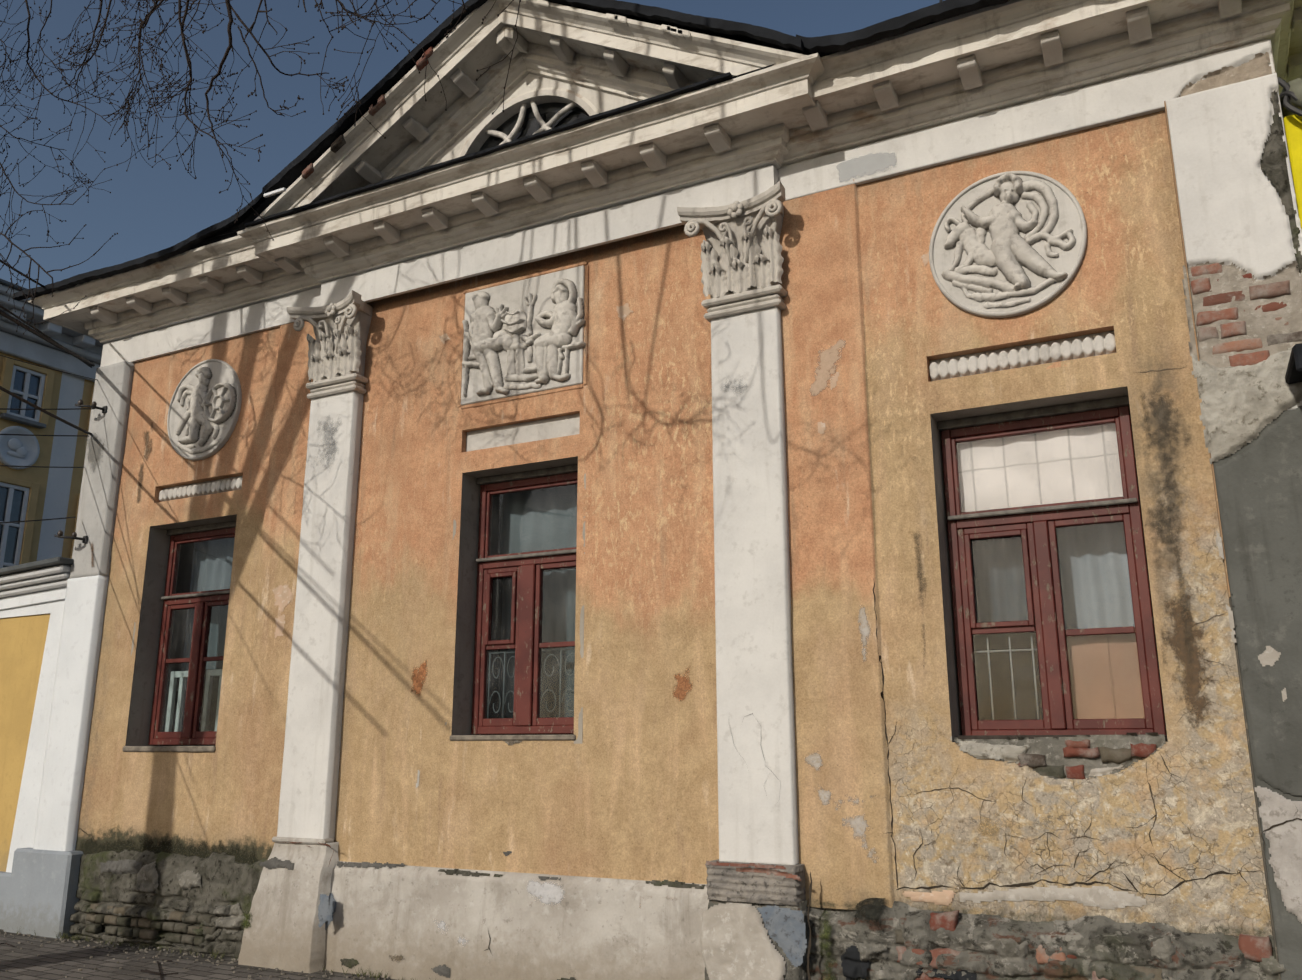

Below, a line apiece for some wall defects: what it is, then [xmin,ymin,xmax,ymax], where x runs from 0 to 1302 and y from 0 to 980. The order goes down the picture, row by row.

flaking render [1177,52,1272,98]
flaking render [1182,90,1302,464]
peeling [809,339,846,396]
peeling [411,662,427,695]
peeling [673,669,692,700]
flaking render [954,732,1166,779]
crack [873,583,1302,896]
peeling [318,893,337,930]
flaking render [841,890,1289,980]